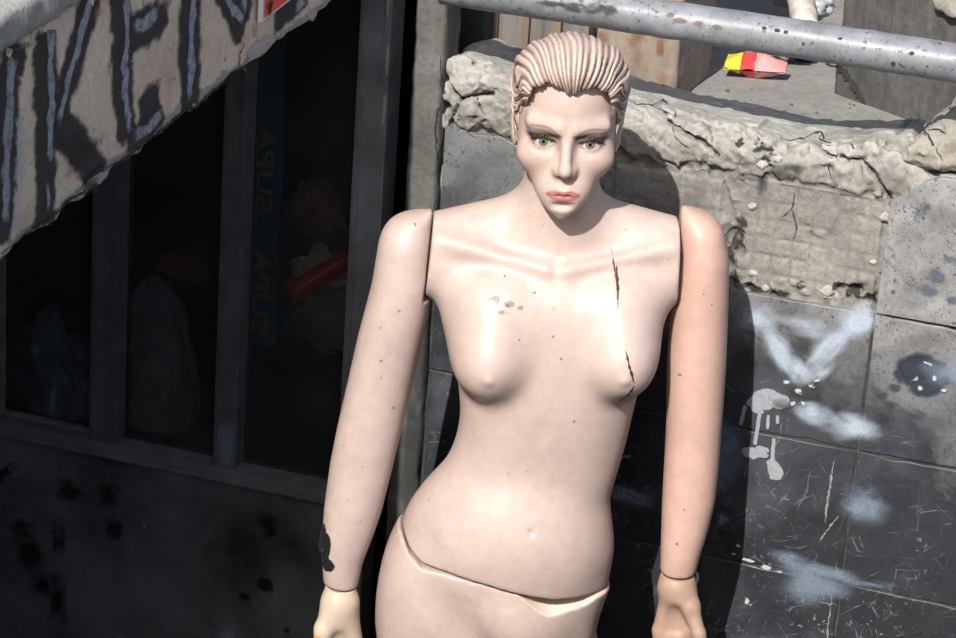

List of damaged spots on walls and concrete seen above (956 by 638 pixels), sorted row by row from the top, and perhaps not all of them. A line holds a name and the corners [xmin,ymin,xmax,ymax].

spalling [735,138,783,170]
crack [917,112,945,161]
crack [782,191,798,239]
spalling [727,203,805,297]
spalling [819,281,877,310]